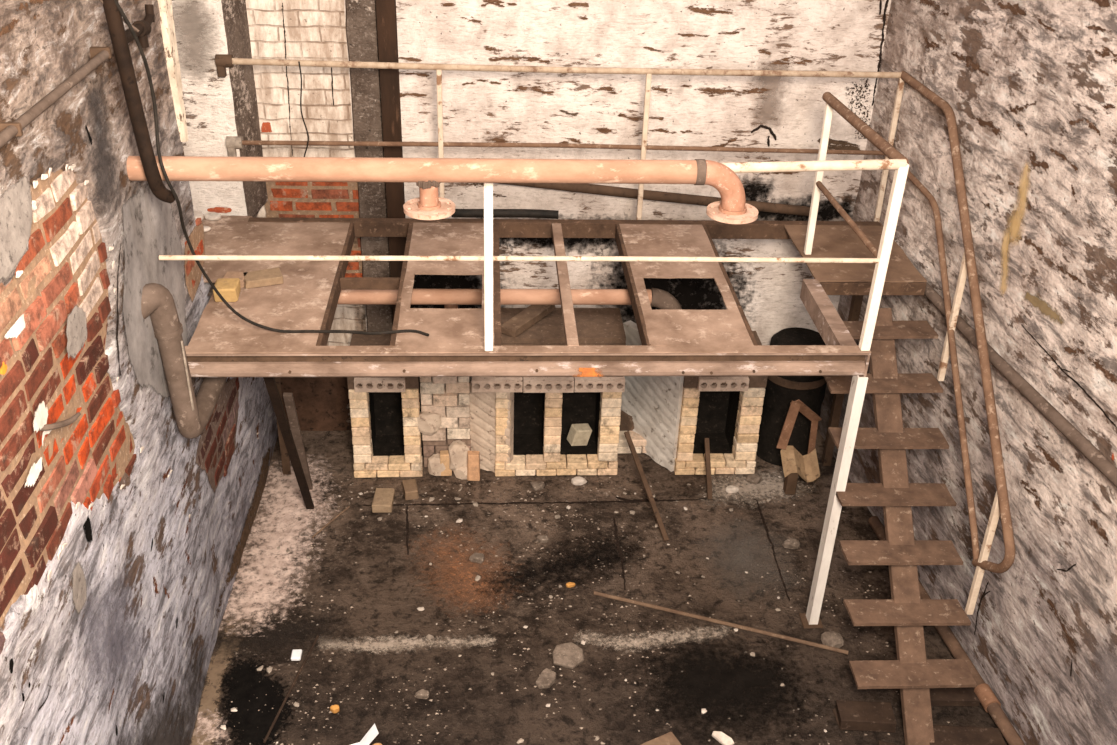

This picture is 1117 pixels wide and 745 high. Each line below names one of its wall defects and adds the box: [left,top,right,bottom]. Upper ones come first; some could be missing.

flaking render [685,6,733,17]
flaking render [484,46,553,64]
crack [872,0,889,106]
flaking render [1085,25,1117,63]
flaking render [462,79,555,96]
flaking render [651,85,771,97]
flaking render [560,113,737,147]
flaking render [972,99,1078,173]
flaking render [264,182,359,218]
flaking render [1063,345,1117,384]
flaking render [0,164,144,673]
flaking render [175,377,241,533]